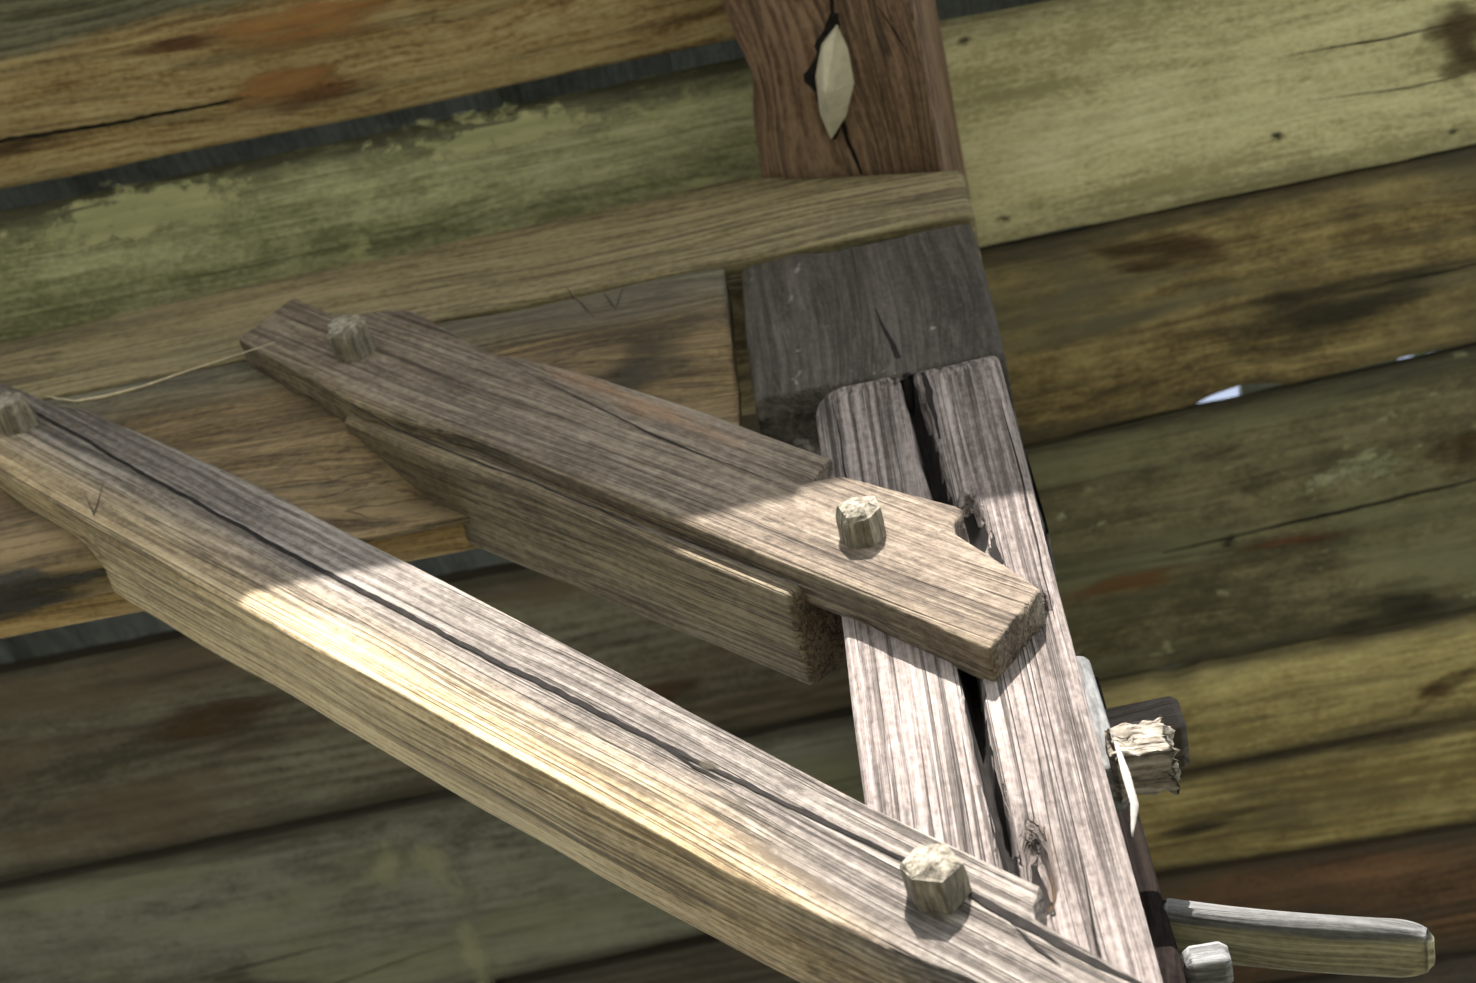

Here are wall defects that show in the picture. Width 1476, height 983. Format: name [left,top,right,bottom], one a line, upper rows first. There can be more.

crack [828,0,836,24]
crack [1285,0,1440,57]
crack [0,81,352,144]
crack [1311,71,1476,101]
crack [841,120,863,175]
leakage [609,336,675,389]
crack [875,309,953,506]
crack [1163,479,1476,553]
leakage [0,568,107,620]
crack [38,413,906,860]
crack [958,669,1141,983]